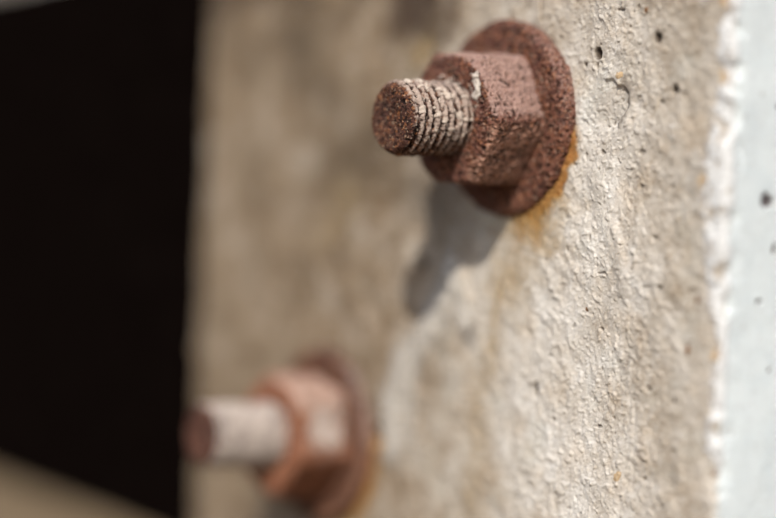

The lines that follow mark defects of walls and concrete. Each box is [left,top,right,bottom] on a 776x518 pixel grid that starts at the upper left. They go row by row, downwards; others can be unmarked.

corrosion [516,126,578,246]